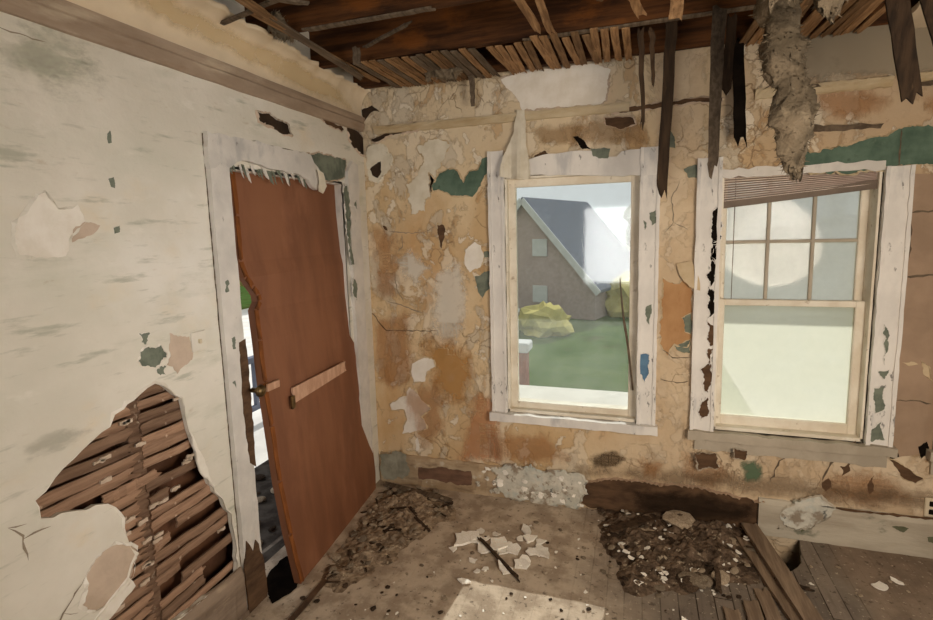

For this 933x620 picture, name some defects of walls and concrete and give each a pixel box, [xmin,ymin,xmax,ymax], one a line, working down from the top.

peeling [10,191,100,260]
spalling [306,151,357,265]
peeling [347,121,487,215]
spalling [436,224,446,250]
peeling [463,241,490,298]
peeling [499,63,662,179]
peeling [645,207,724,421]
spalling [35,332,239,620]
peeling [380,353,765,510]
spalling [871,324,890,442]